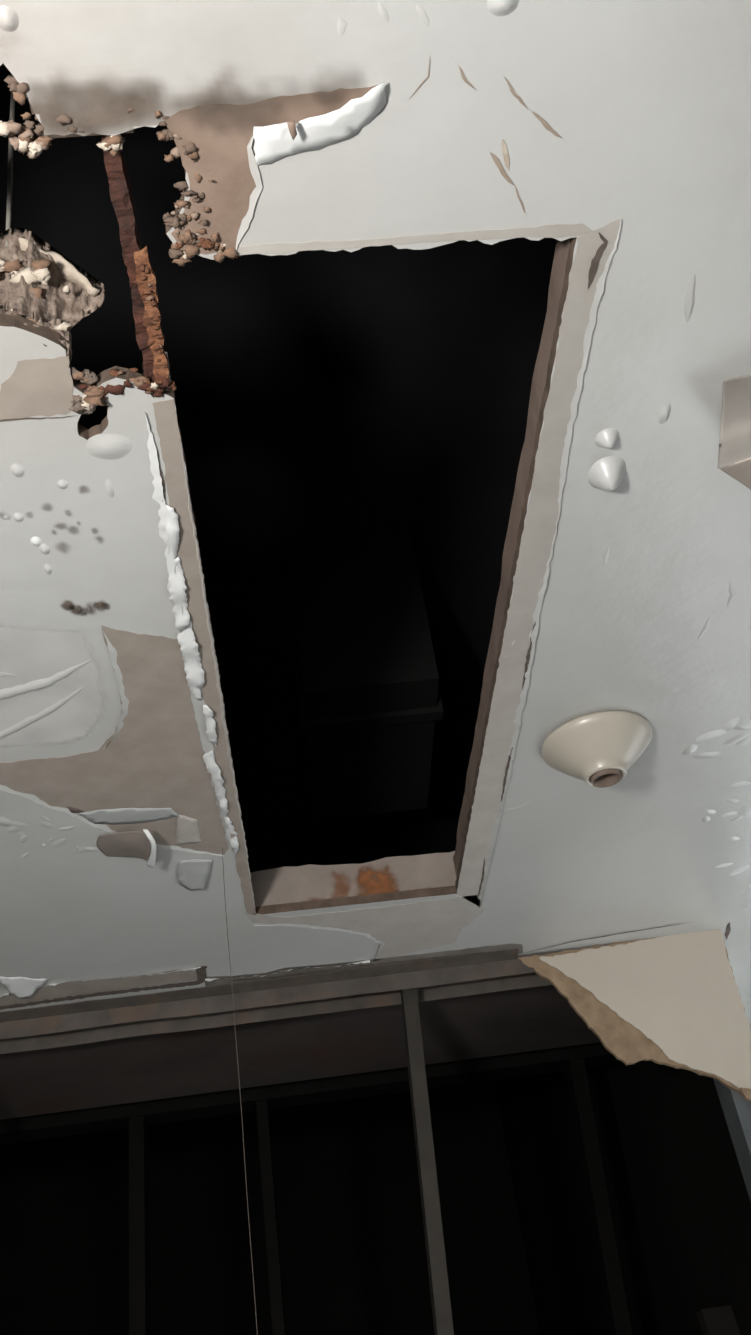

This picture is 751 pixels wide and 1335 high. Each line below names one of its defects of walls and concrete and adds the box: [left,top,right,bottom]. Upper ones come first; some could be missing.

spalling [0,75,77,159]
rust [96,134,126,158]
crack [410,55,562,138]
crack [490,139,525,213]
rust [110,368,177,391]
peeling [717,374,751,490]
peeling [155,82,622,907]
peeling [0,304,256,915]
rust [333,867,398,898]
peeling [0,922,691,1010]